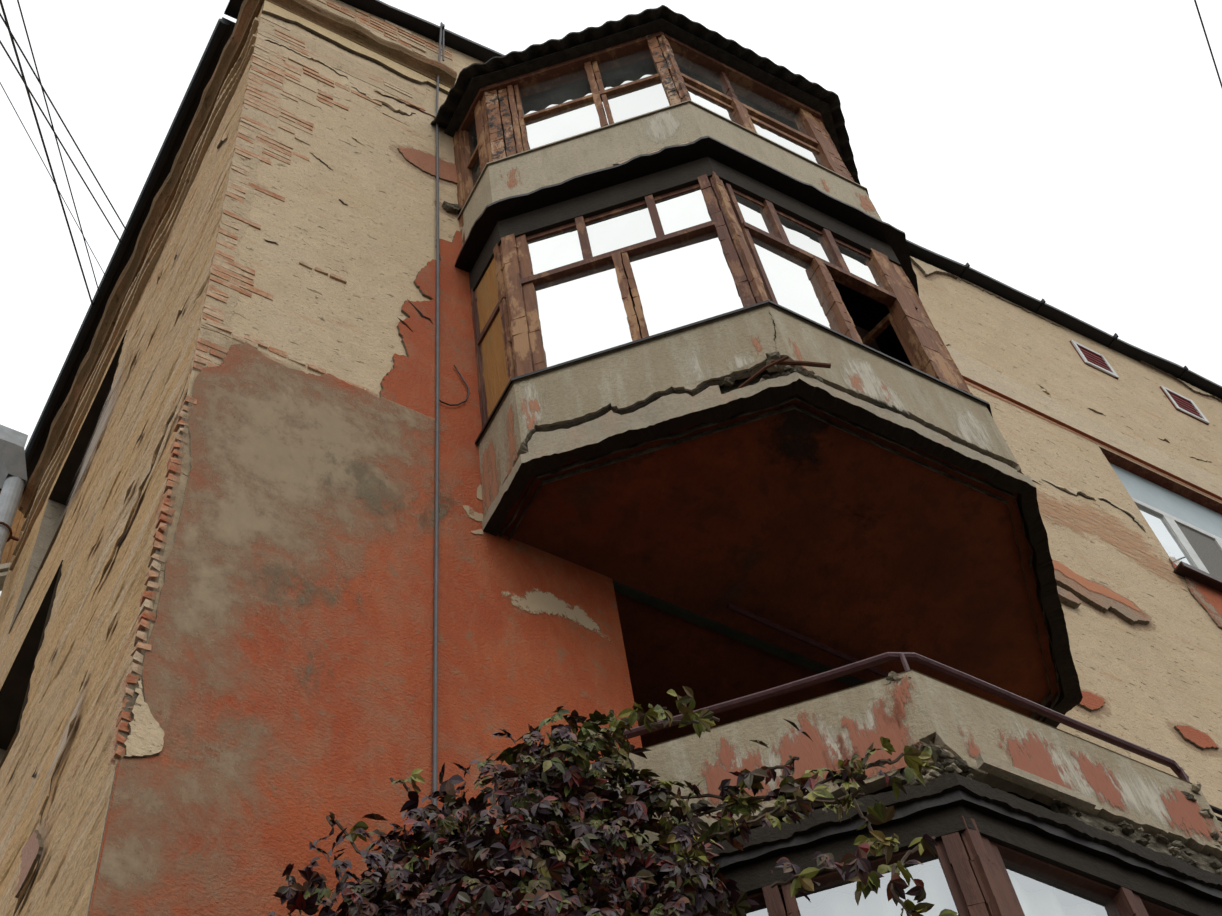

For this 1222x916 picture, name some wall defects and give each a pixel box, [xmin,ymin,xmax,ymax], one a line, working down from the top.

crack [265,19,420,116]
flaking render [190,16,436,397]
peeling [391,145,458,186]
crack [546,312,777,428]
crack [870,402,994,459]
crack [1022,473,1146,532]
flaking render [108,395,197,767]
peeling [502,588,610,641]
peeling [1036,489,1222,631]
peeling [1076,689,1110,717]
peeling [1167,722,1222,756]
spalling [1050,783,1222,876]